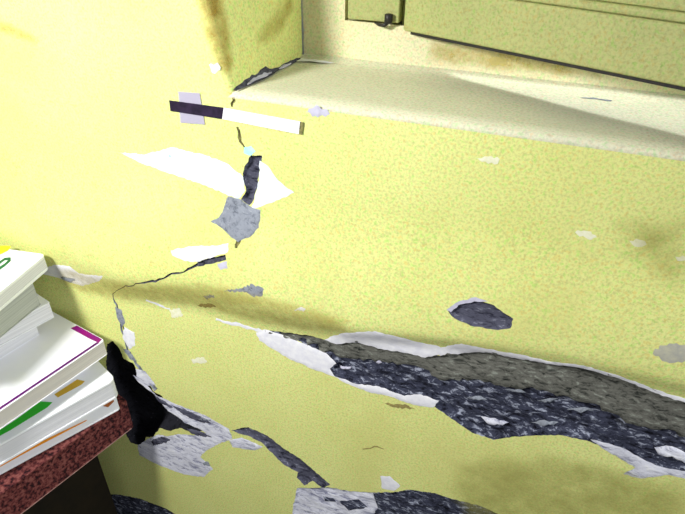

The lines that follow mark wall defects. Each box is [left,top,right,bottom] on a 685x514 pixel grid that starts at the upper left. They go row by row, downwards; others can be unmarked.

peeling [122,146,294,262]
peeling [44,265,103,286]
crack [113,241,241,391]
peeling [225,284,264,297]
flaking render [447,297,513,330]
flaking render [106,341,497,514]
flaking render [255,329,685,479]